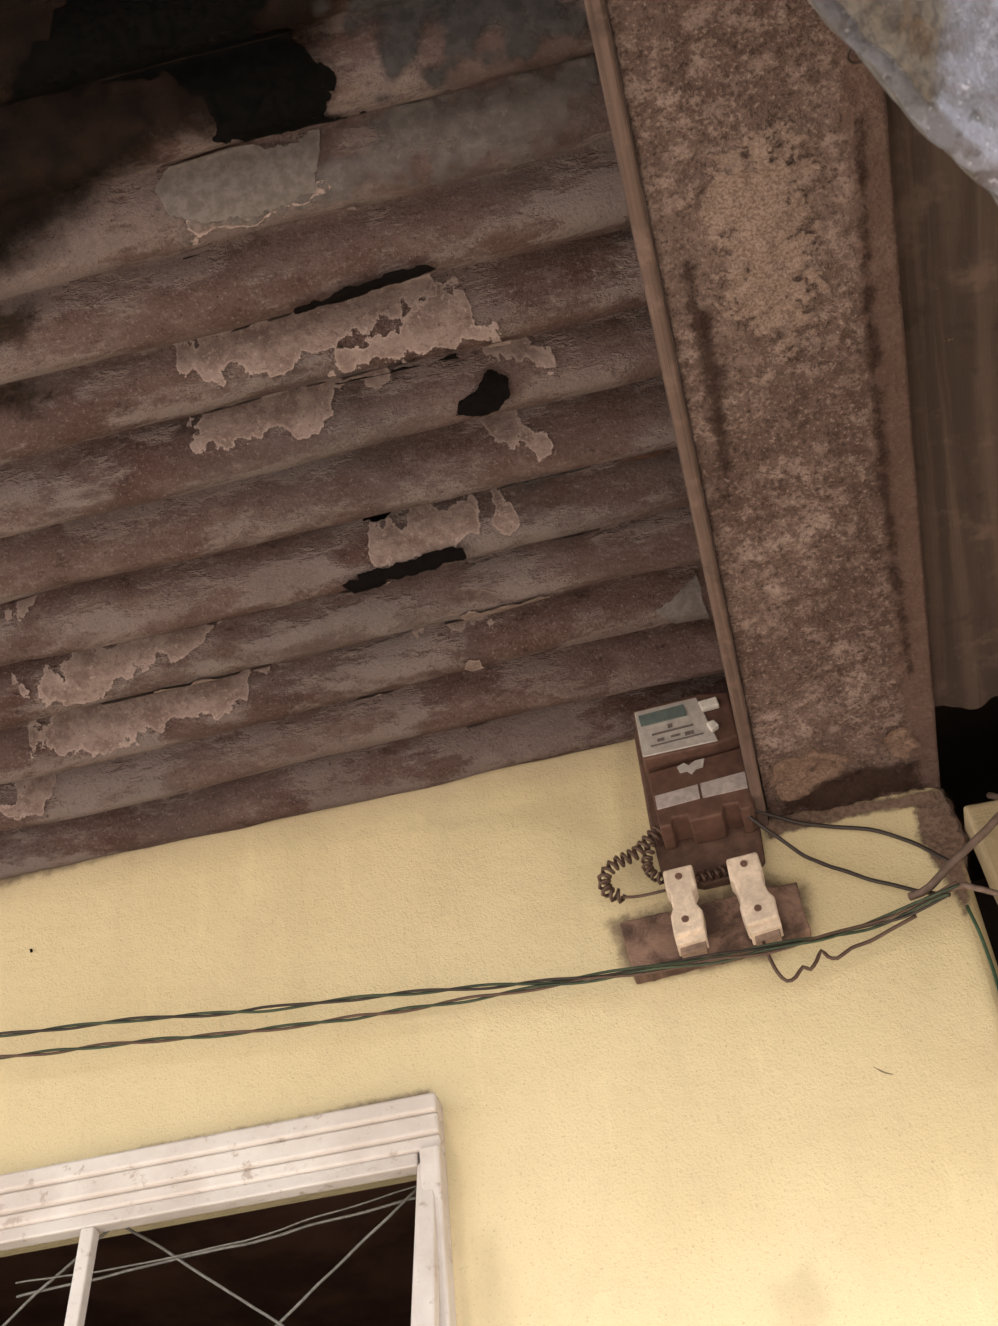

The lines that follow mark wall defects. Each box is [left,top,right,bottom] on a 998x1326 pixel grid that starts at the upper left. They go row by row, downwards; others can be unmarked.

peeling [154,0,597,245]
peeling [172,274,556,468]
peeling [367,410,590,584]
peeling [11,620,271,759]
peeling [0,774,56,821]